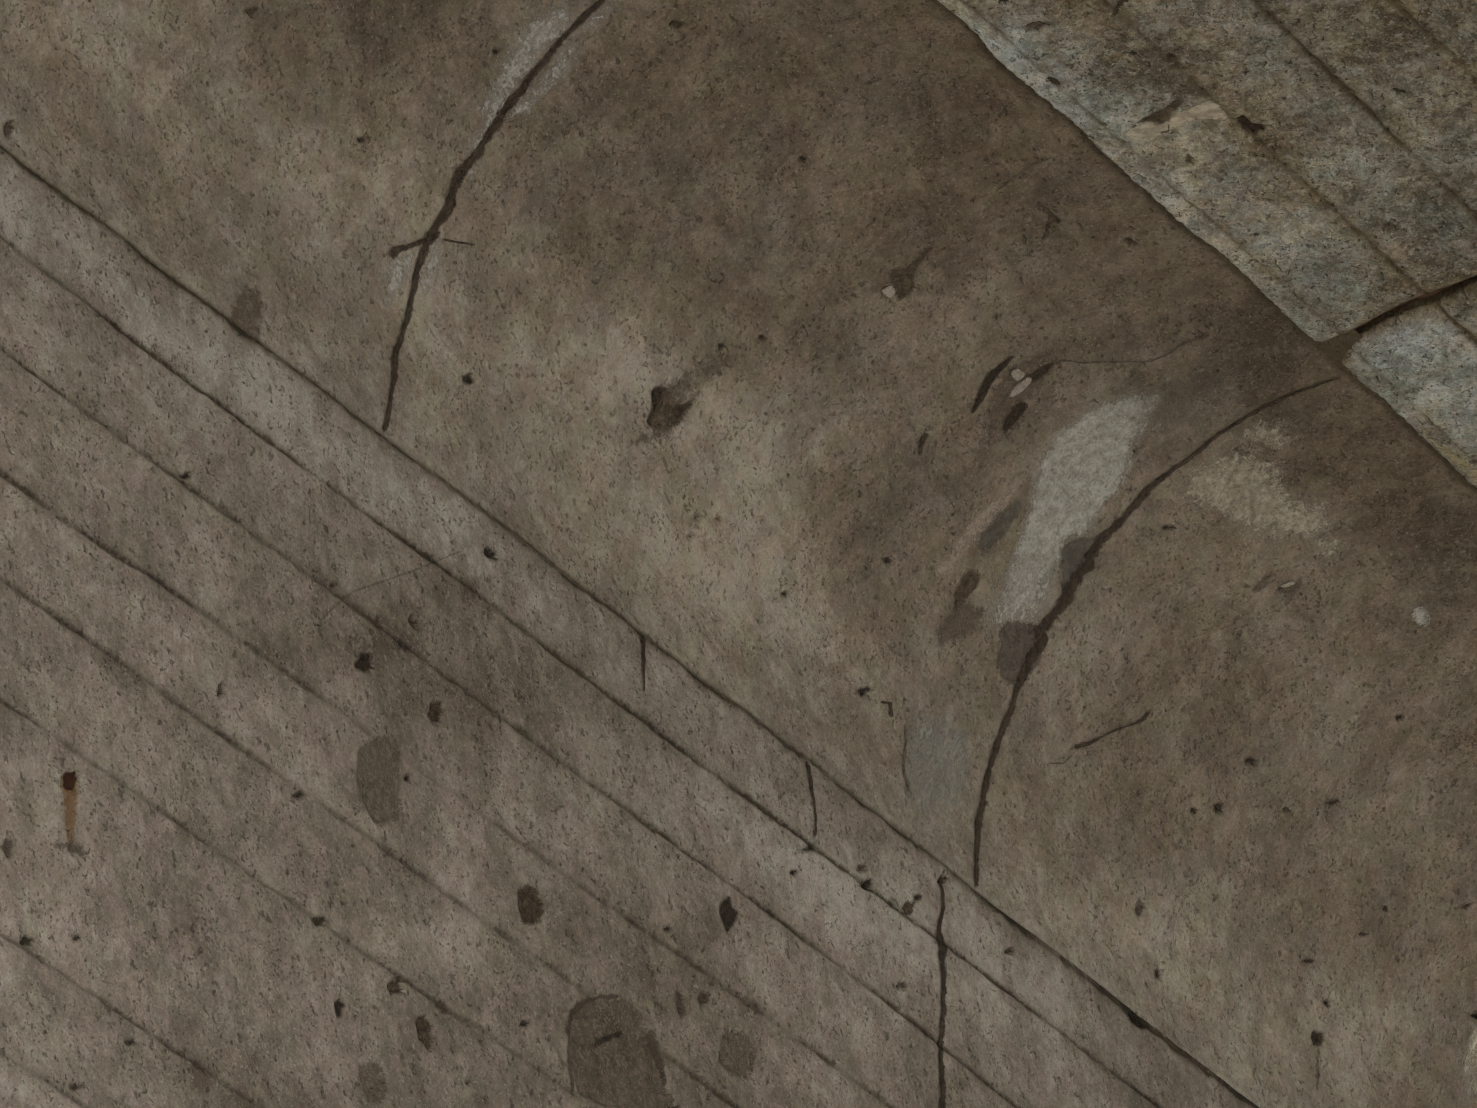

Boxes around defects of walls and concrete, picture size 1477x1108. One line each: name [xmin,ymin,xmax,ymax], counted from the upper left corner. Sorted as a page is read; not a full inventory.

crack [383,0,605,432]
crack [919,433,929,454]
leakage [937,395,1159,684]
corrosion [58,771,90,858]
crack [936,378,1339,1108]